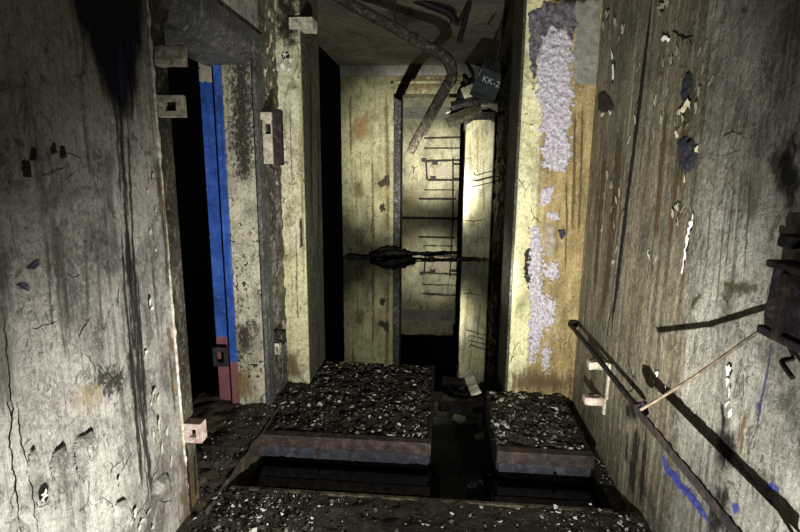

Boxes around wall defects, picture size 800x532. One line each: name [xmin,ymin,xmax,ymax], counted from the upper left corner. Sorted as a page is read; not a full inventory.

corrosion [398,76,445,93]
peeling [522,0,625,172]
spalling [674,47,713,183]
hole [21,147,37,177]
hole [50,143,67,159]
peeling [681,213,694,272]
peeling [523,185,566,374]
crack [2,307,47,529]
peeling [38,482,49,503]